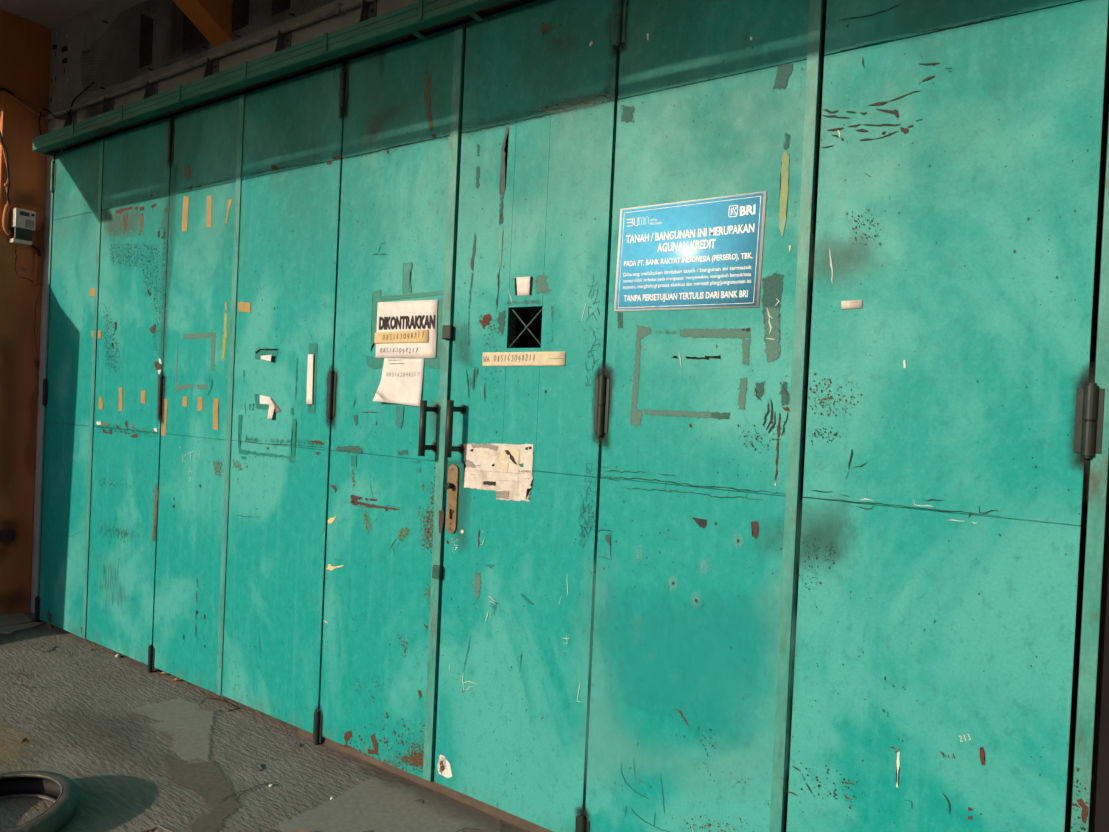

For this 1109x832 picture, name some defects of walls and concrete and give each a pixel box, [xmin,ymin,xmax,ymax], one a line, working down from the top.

corrosion [350,485,400,521]
corrosion [419,473,444,553]
peeling [130,698,214,761]
corrosion [332,712,425,772]
peeling [437,755,452,778]
peeling [267,778,502,832]